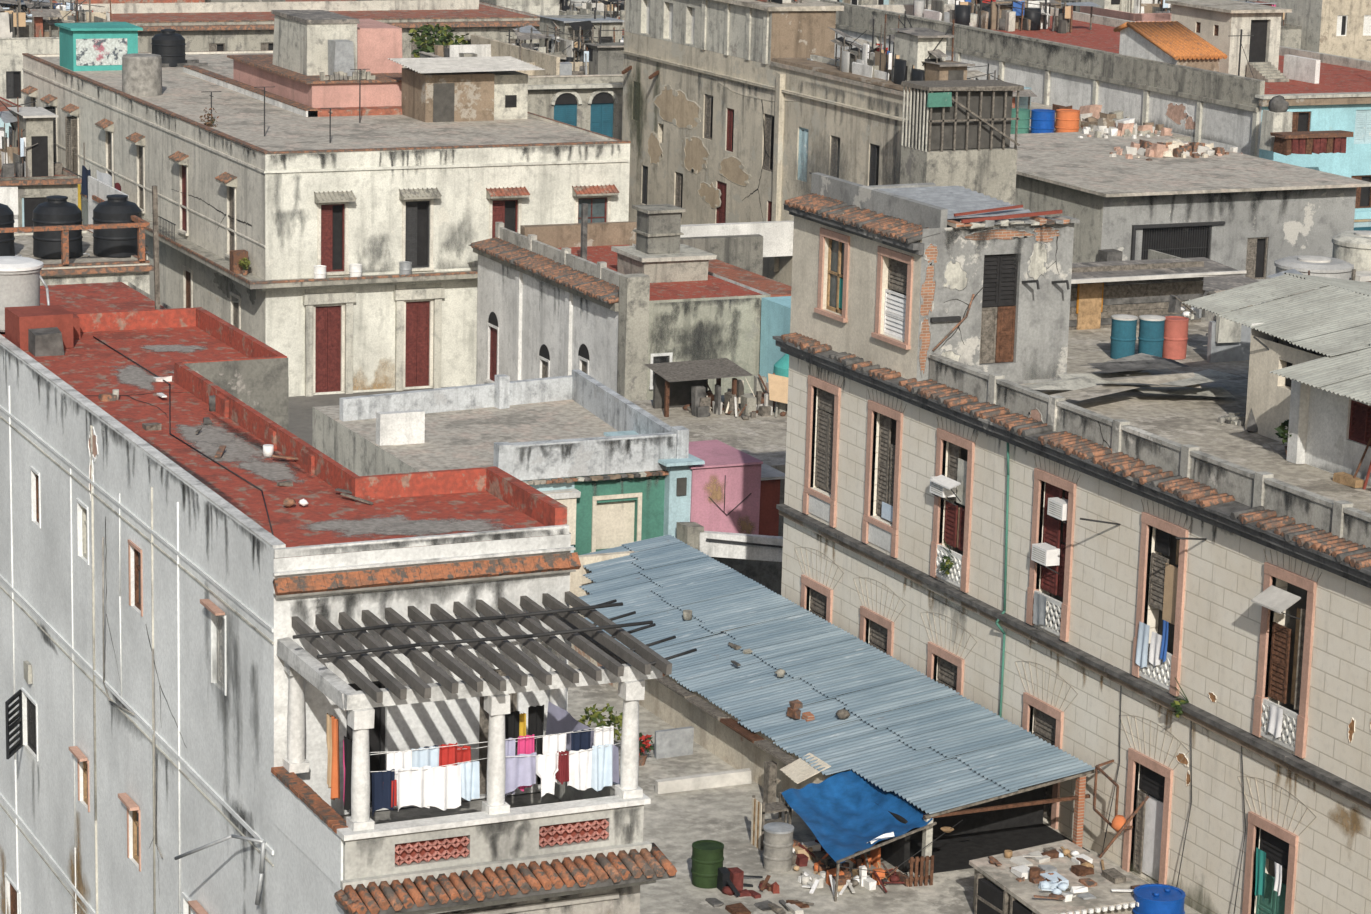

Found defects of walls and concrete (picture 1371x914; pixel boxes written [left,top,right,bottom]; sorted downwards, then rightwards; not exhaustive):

flaking render [1165,102,1196,130]
flaking render [697,156,751,210]
flaking render [919,242,969,378]
damp [148,459,259,557]
damp [1334,809,1361,836]